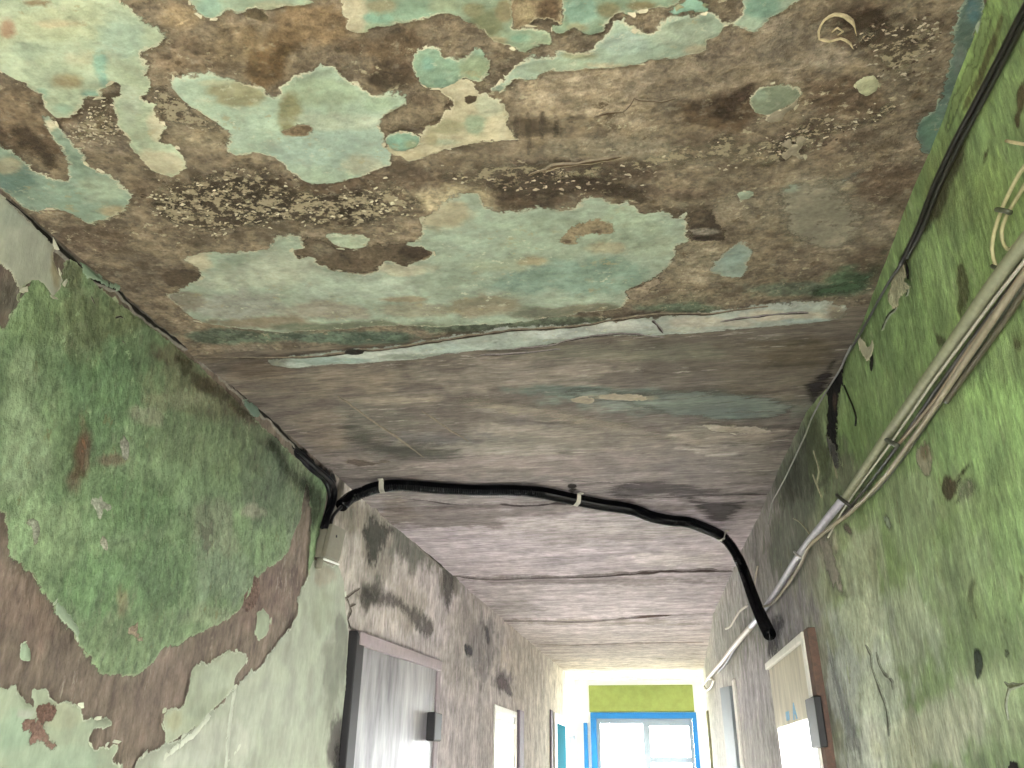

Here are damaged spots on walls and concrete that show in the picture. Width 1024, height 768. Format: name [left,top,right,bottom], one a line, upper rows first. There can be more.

water stain [12,126,57,170]
water stain [368,71,401,89]
water stain [714,83,754,118]
peeling [617,82,905,186]
peeling [841,0,985,154]
water stain [493,175,636,200]
peeling [888,261,911,309]
crack [5,198,809,465]
peeling [0,0,799,768]
spalling [826,361,846,469]
crack [375,508,733,581]
crack [504,613,705,646]